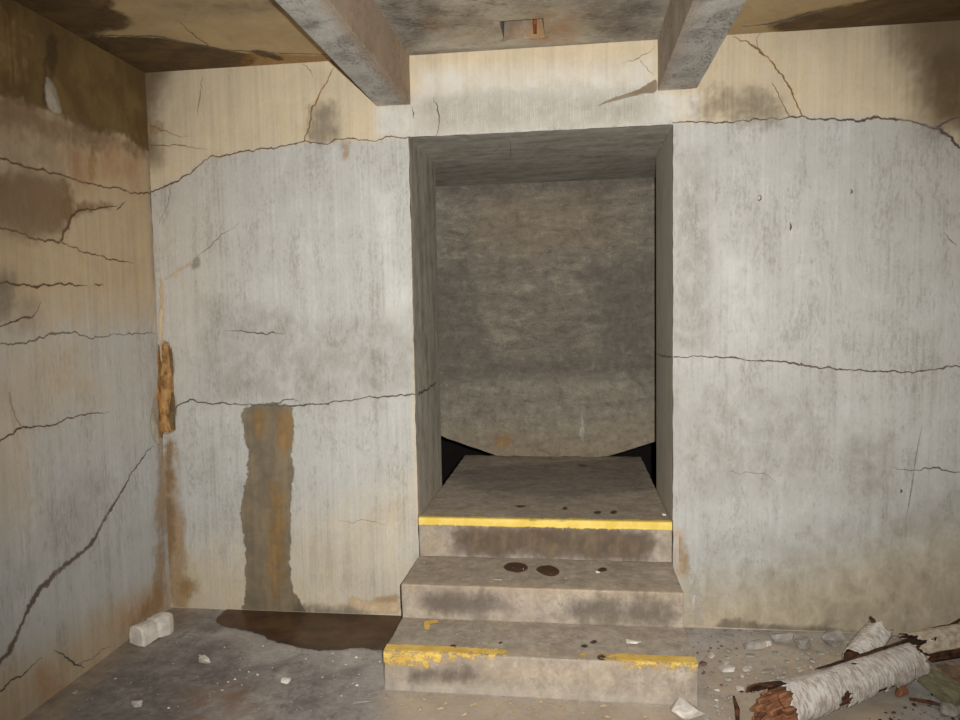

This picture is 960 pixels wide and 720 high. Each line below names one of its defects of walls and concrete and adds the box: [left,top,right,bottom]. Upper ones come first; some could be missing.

crack [0,23,440,263]
crack [672,8,960,149]
crack [0,412,107,442]
crack [0,280,156,345]
crack [174,382,436,409]
crack [658,354,960,373]
crack [0,447,152,692]
corrosion [158,446,192,607]